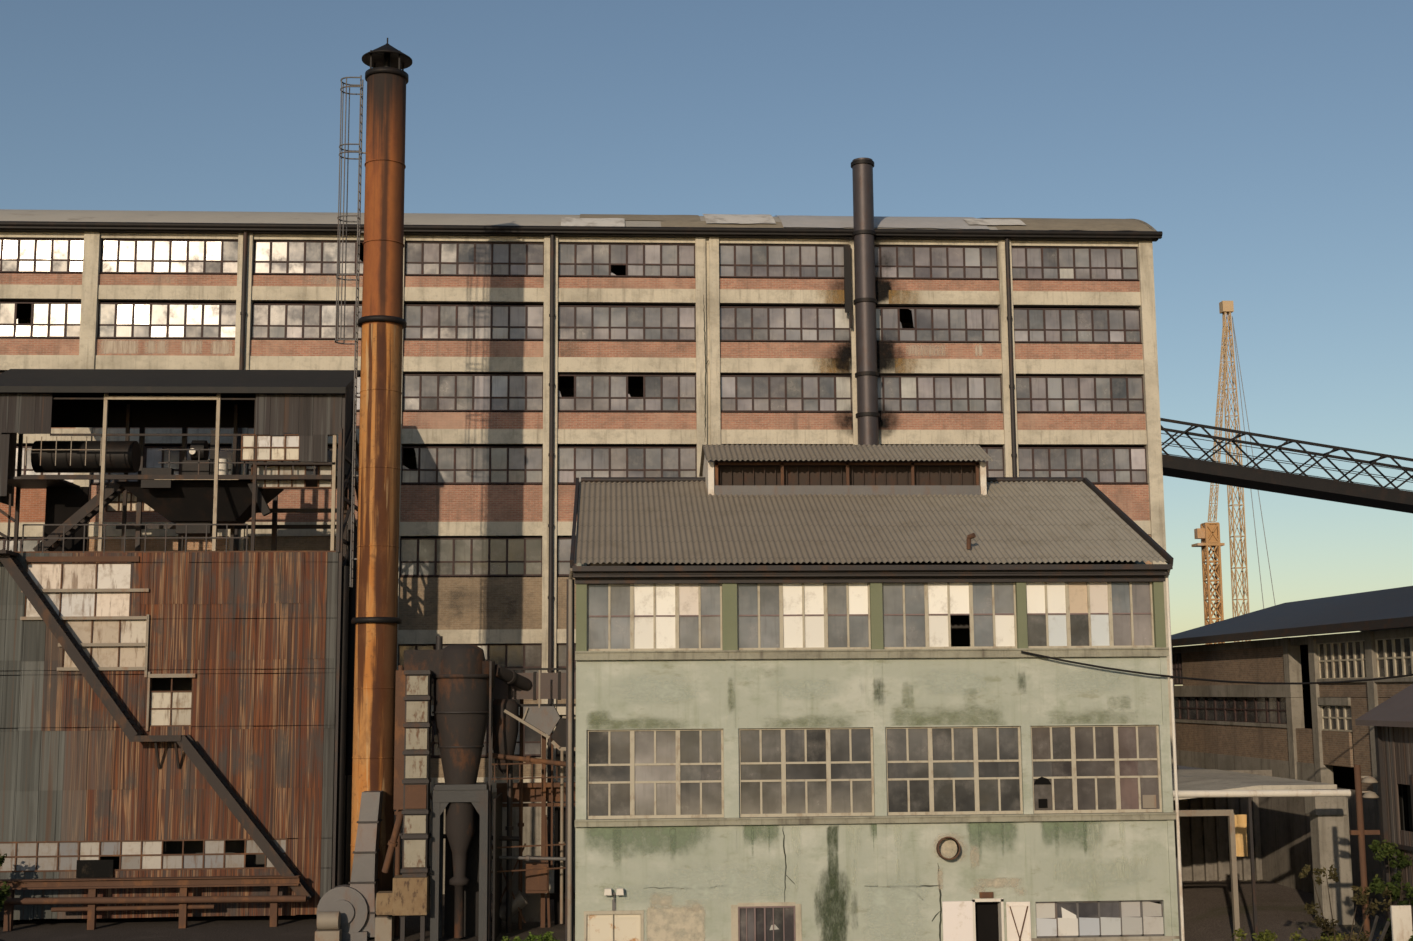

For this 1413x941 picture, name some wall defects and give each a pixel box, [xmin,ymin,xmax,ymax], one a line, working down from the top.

leakage [821,823,877,941]